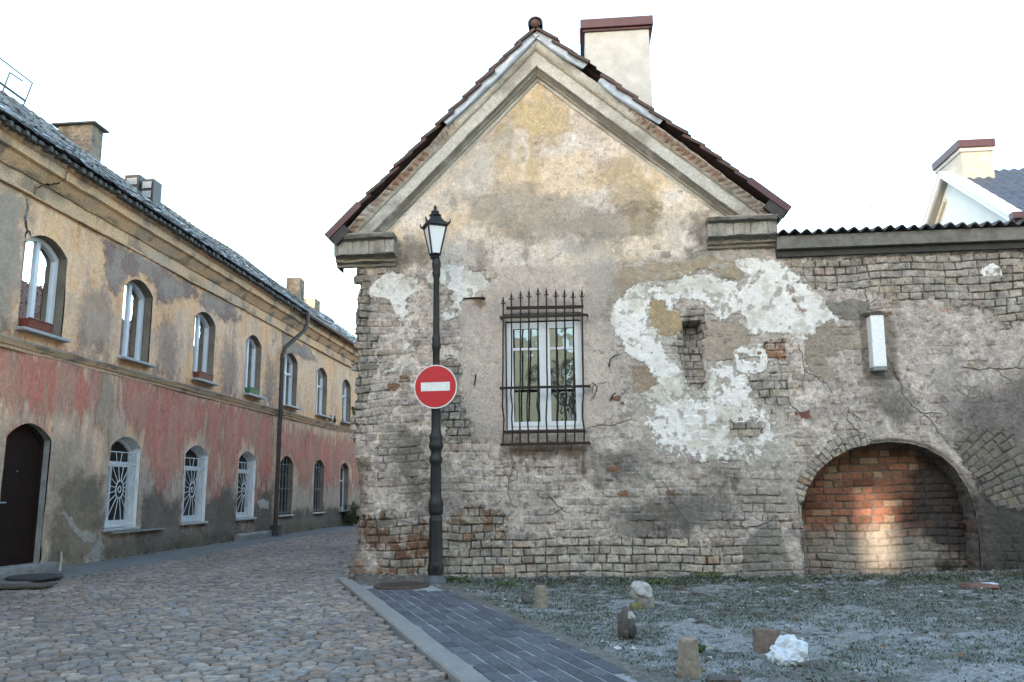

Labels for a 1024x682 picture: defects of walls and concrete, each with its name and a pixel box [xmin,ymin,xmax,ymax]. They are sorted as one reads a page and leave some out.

crack [23,171,69,239]
peeling [0,345,103,434]
peeling [112,264,489,517]
spalling [608,250,1024,468]
crack [882,353,951,444]
crack [955,355,1024,408]
spalling [360,508,429,575]
spalling [442,501,739,578]